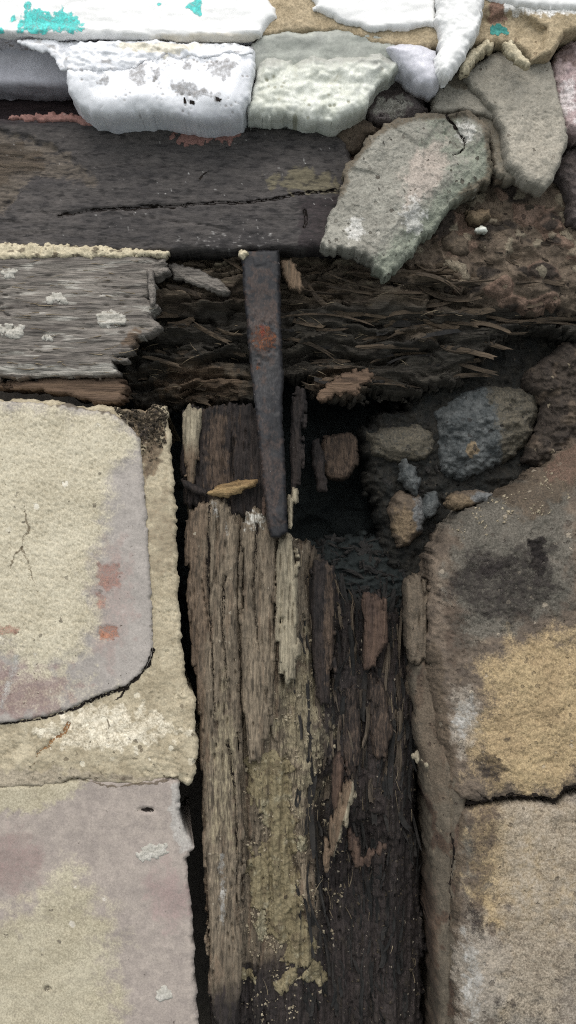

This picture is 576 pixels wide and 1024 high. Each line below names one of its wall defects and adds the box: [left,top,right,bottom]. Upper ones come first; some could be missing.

crack [446,114,466,155]
crack [57,171,337,228]
crack [465,785,576,805]